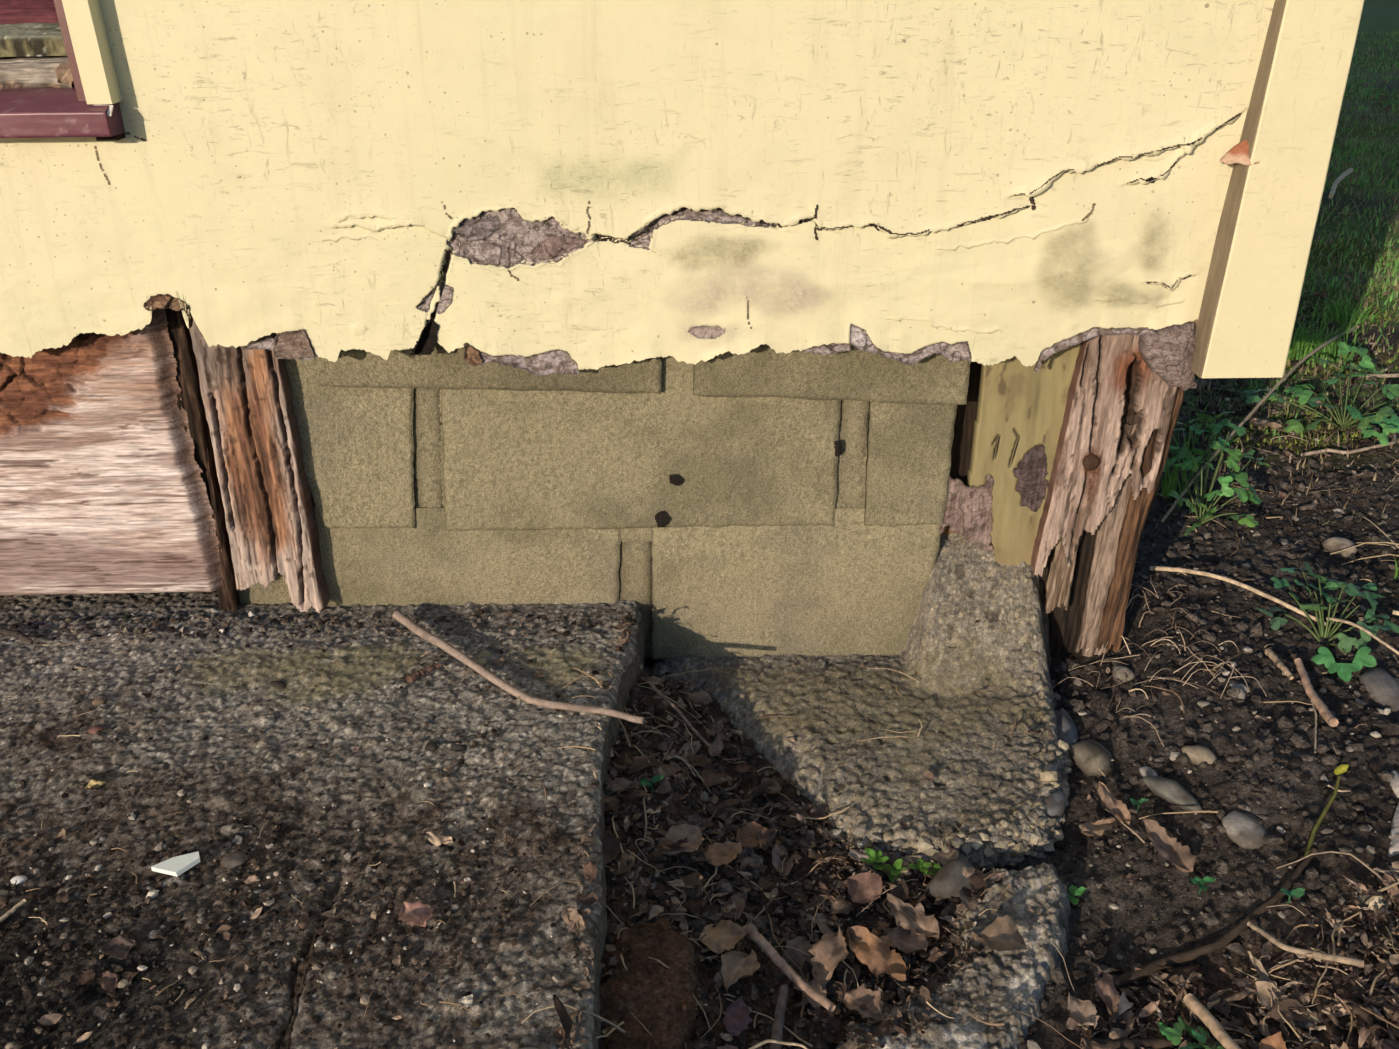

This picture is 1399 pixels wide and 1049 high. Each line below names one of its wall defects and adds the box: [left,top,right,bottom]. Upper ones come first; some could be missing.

spalling [444,204,596,273]
crack [410,205,453,356]
peeling [143,294,191,319]
peeling [244,329,315,361]
peeling [463,343,579,376]
peeling [688,325,725,339]
crack [745,297,753,329]
peeling [802,324,972,365]
spalling [1034,321,1198,391]
peeling [1013,445,1049,512]
peeling [939,474,994,551]